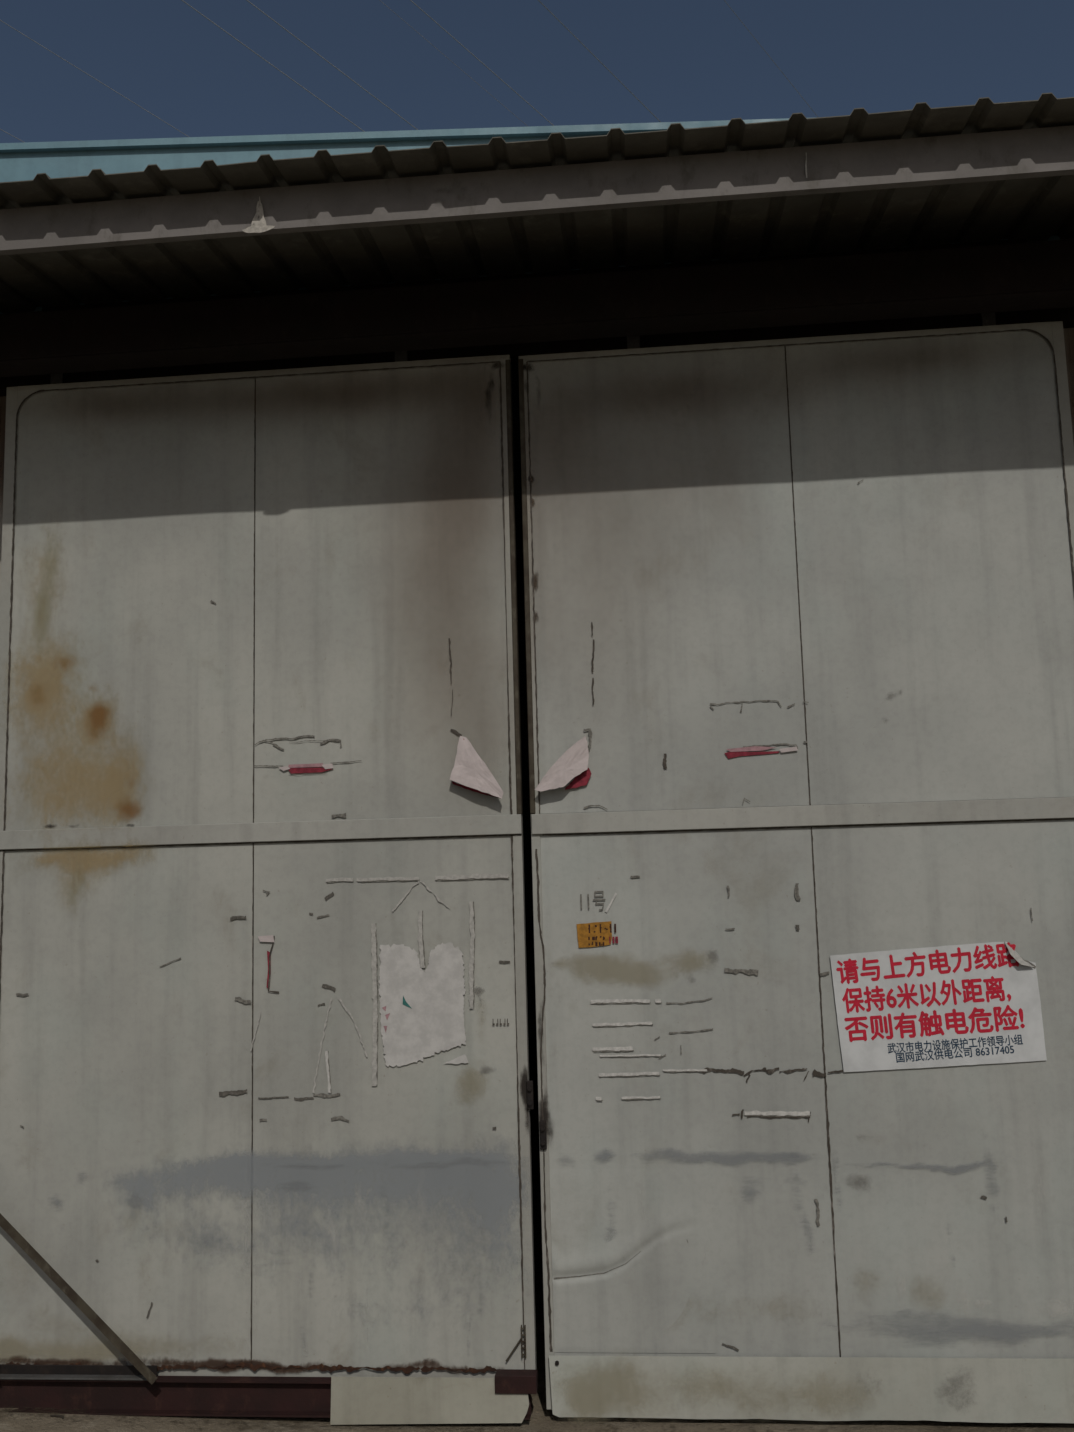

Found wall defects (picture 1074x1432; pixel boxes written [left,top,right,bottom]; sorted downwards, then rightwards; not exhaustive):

rust [6,1357,127,1365]
rust [150,1359,497,1374]